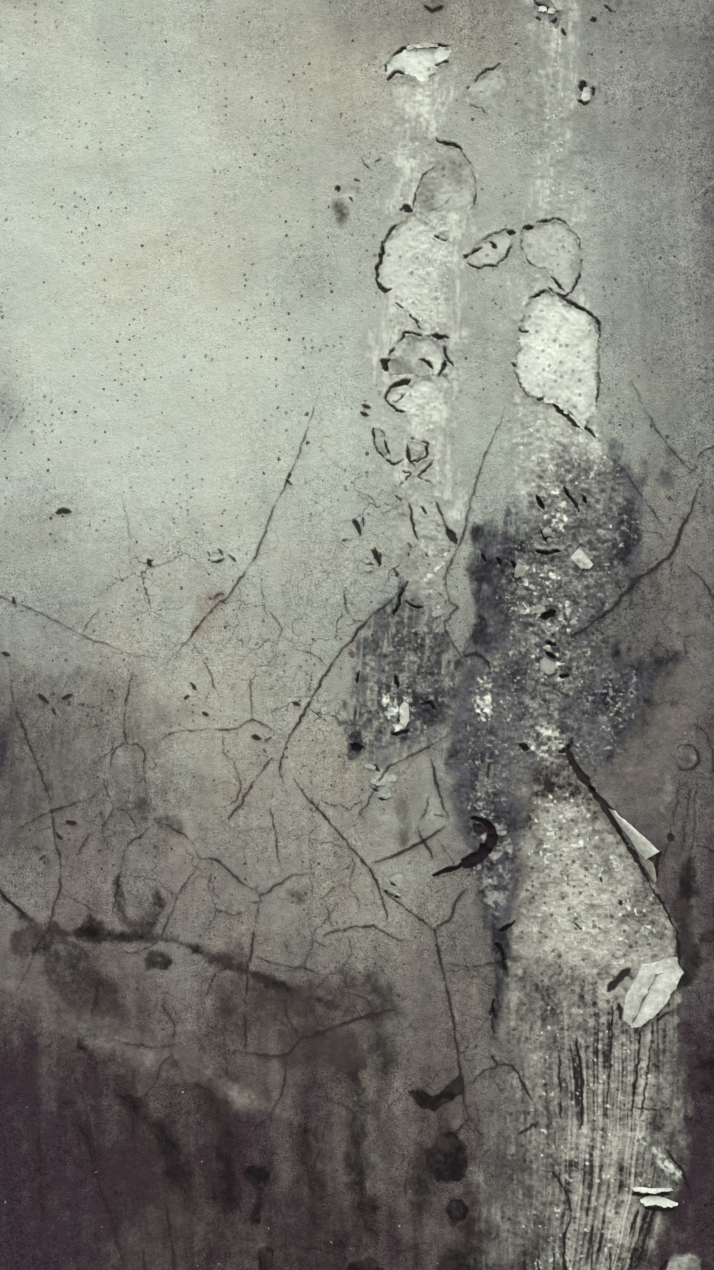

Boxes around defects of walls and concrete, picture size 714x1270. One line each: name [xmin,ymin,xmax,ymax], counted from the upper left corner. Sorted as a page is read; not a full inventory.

peeling [383,43,452,82]
peeling [375,138,601,438]
peeling [356,404,452,736]
crack [571,388,714,638]
damp [0,876,395,1107]
damp [174,1052,270,1223]
crack [0,408,538,1136]
damp [408,1075,464,1111]
damp [414,1131,467,1215]
peeling [466,447,690,1270]
peeling [660,1254,700,1270]
damp [674,861,714,986]